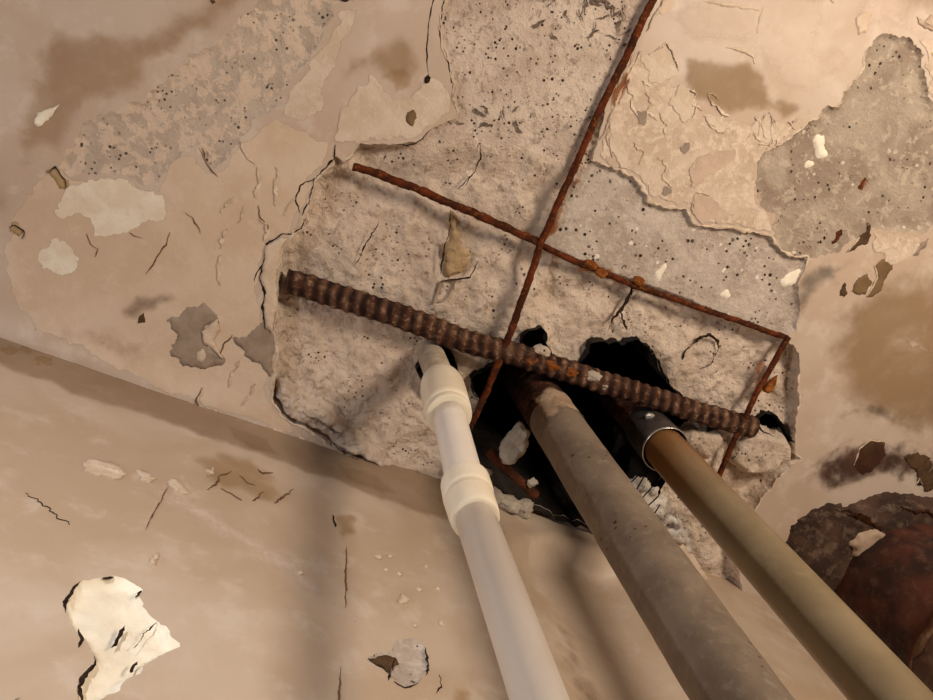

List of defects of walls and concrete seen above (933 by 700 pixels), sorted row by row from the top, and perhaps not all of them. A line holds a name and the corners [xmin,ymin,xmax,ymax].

corrosion [613,73,629,105]
damp [690,64,762,102]
crack [254,147,335,334]
spalling [0,0,933,511]
corrosion [578,259,611,279]
corrosion [762,375,777,394]
crack [26,493,70,525]
spalling [485,448,590,530]
spalling [656,477,742,590]
damp [820,448,933,492]
flaking render [62,576,180,700]
flaking render [367,637,429,688]